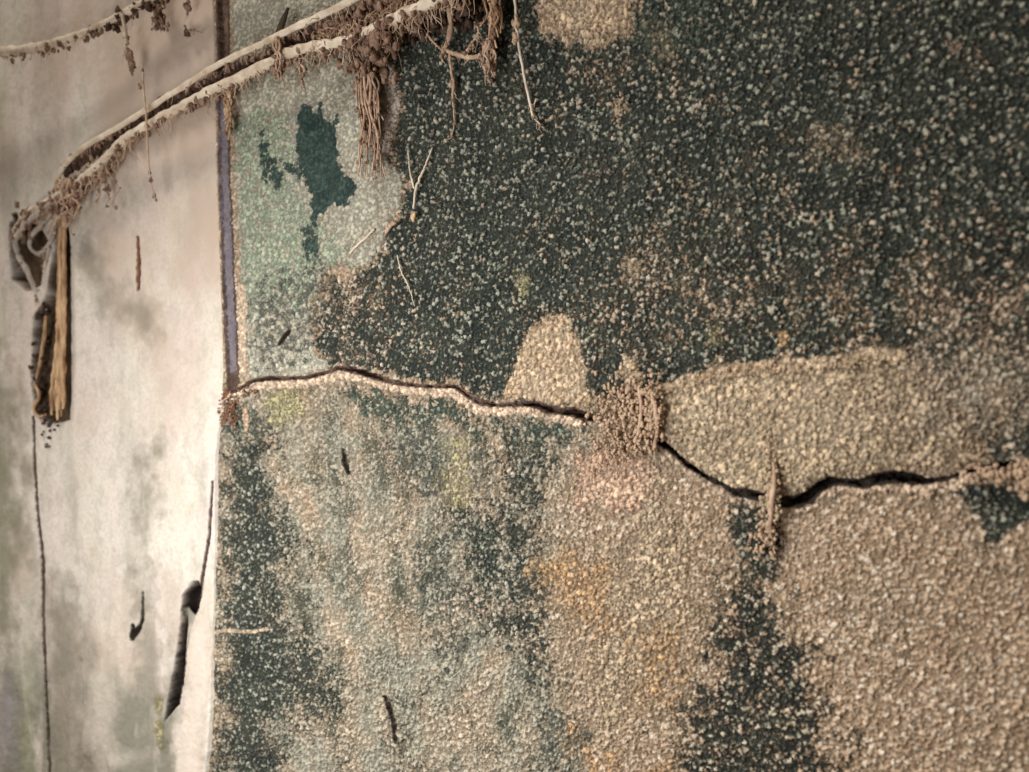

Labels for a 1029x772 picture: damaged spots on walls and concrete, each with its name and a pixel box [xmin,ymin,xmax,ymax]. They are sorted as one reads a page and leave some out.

crack [341,449,350,474]
water stain [386,421,450,502]
crack [653,437,1017,508]
water stain [725,497,788,596]
water stain [379,524,482,772]